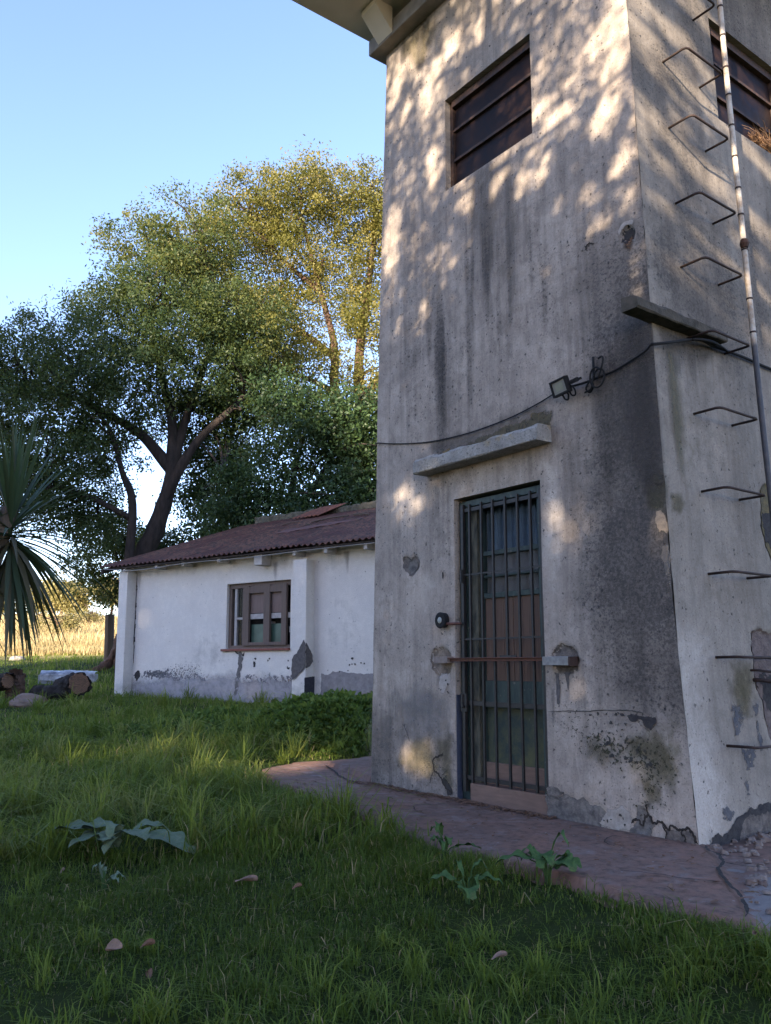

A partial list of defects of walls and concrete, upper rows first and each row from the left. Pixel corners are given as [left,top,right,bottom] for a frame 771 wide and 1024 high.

spalling [760,483,771,558]
spalling [403,556,419,576]
peeling [133,668,209,683]
peeling [245,640,373,695]
peeling [545,643,685,836]
spalling [712,628,771,845]
crack [430,753,453,795]